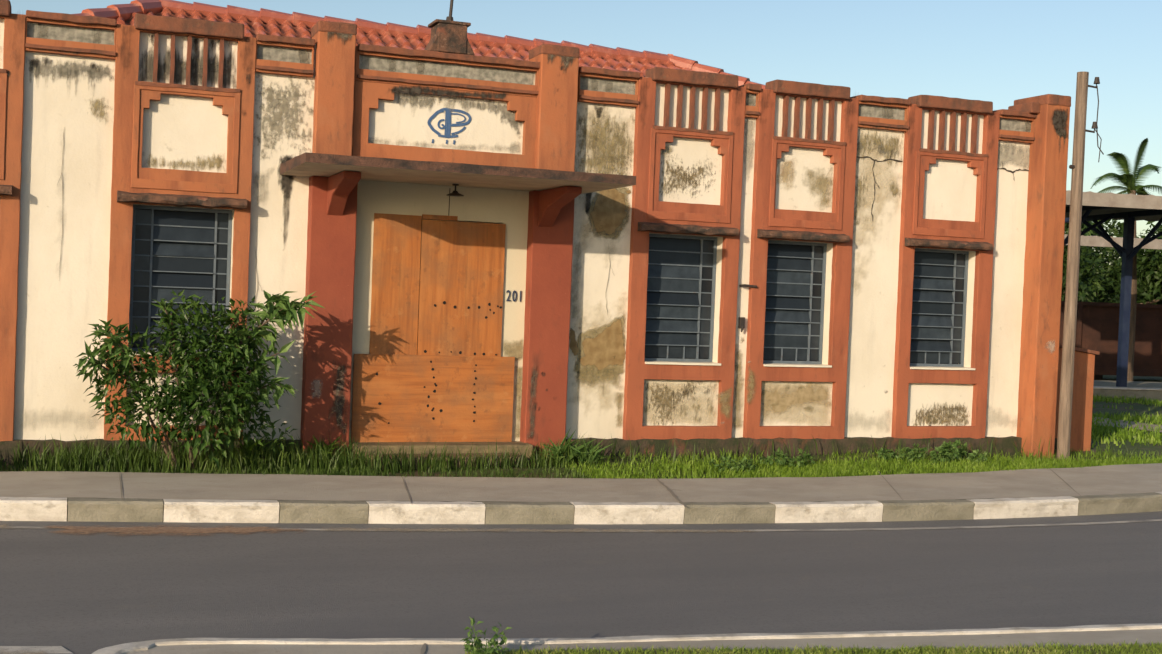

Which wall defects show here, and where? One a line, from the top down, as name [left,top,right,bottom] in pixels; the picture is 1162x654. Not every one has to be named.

leakage [361,55,535,152]
leakage [548,54,573,70]
leakage [580,77,635,95]
leakage [27,22,314,242]
leakage [659,147,716,195]
leakage [808,172,833,205]
crack [858,149,903,222]
spalling [586,187,631,239]
spalling [569,316,626,377]
leakage [644,382,713,424]
leakage [913,404,969,426]